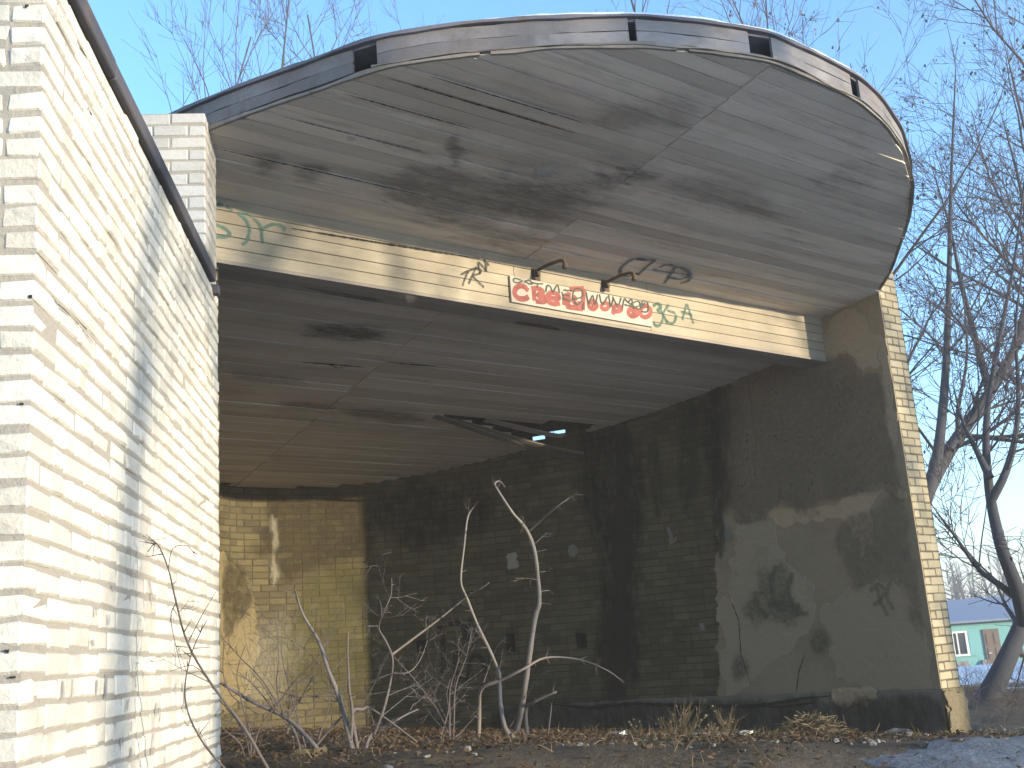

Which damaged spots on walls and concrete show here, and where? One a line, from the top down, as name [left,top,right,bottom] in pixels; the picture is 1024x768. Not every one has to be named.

peeling [823,308,898,446]
leakage [223,560,252,633]
peeling [219,551,261,714]
leakage [263,488,483,580]
crack [544,592,831,710]
leakage [493,421,944,734]
peeling [699,483,969,733]